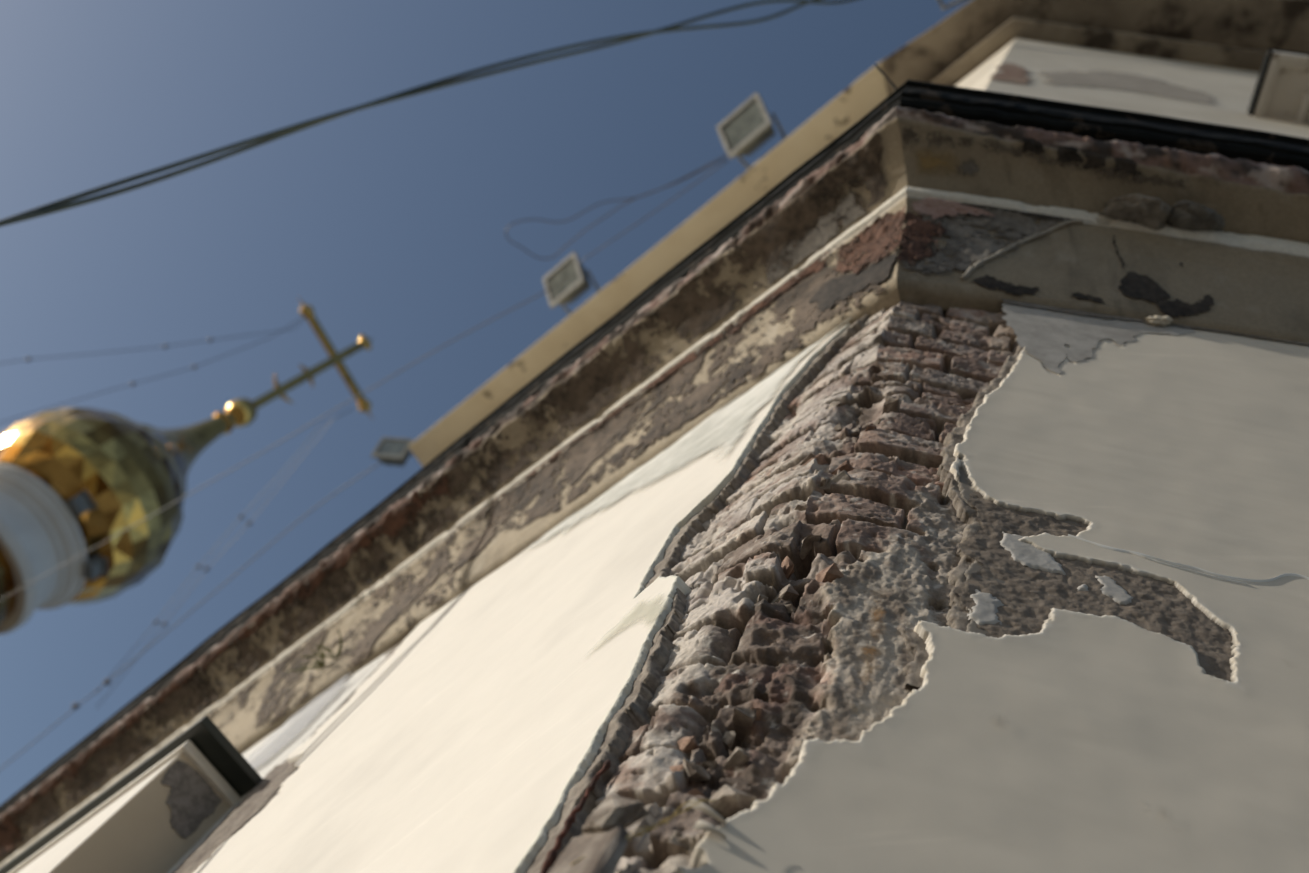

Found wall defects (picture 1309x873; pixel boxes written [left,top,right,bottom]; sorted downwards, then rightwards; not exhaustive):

spalling [897,209,947,266]
spalling [525,271,1309,873]
crack [1068,534,1309,585]
spalling [161,760,296,873]